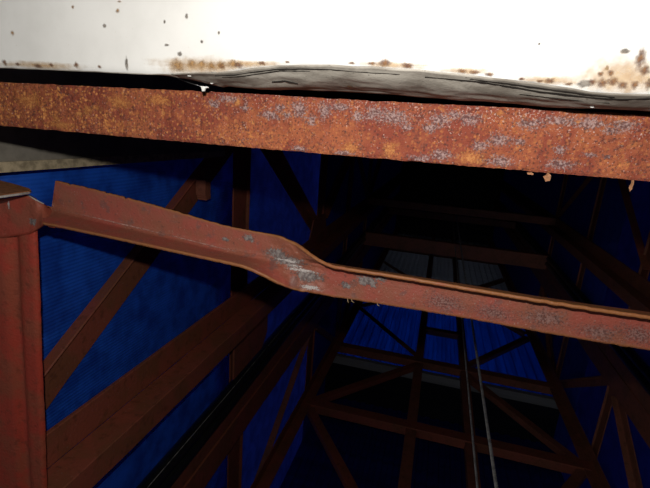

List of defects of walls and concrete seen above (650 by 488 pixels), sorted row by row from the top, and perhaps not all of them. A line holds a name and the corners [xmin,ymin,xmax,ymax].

corrosion [174,52,265,71]
corrosion [369,59,412,68]
corrosion [566,50,650,88]
corrosion [454,150,483,164]
peeling [265,248,324,290]
peeling [341,276,385,289]